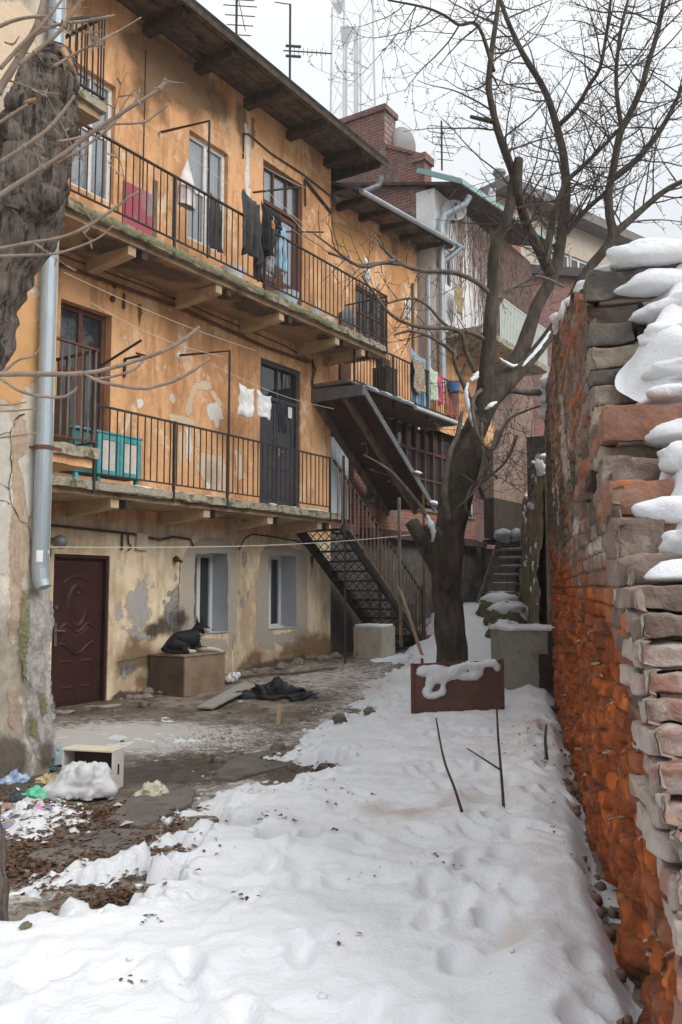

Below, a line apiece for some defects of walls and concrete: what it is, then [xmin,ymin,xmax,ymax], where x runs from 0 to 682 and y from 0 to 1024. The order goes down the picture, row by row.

crack [0,413,31,568]
spalling [98,483,168,497]
peeling [168,381,245,501]
peeling [115,573,180,640]